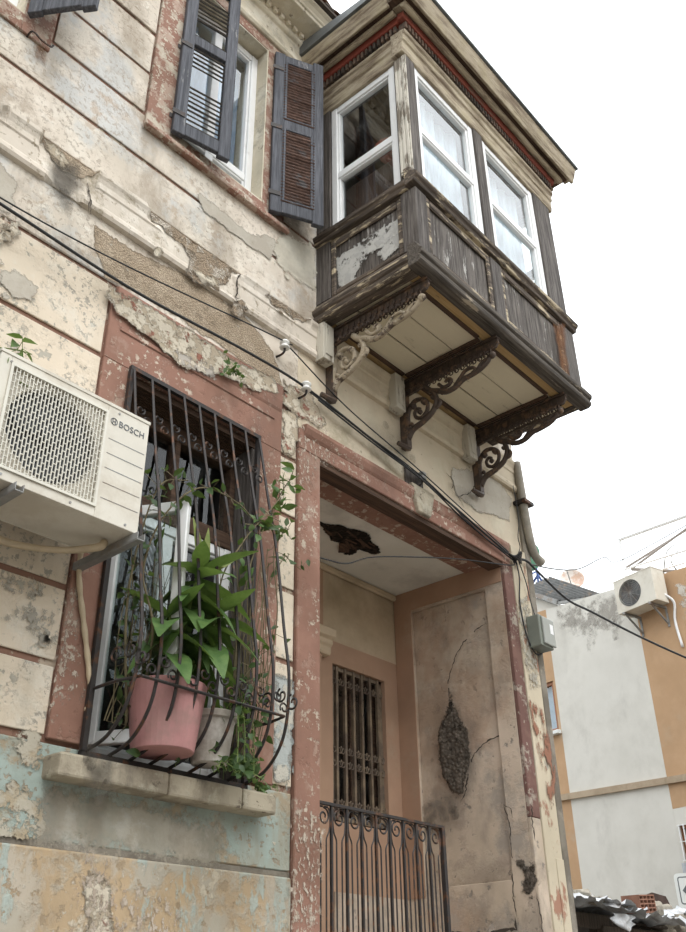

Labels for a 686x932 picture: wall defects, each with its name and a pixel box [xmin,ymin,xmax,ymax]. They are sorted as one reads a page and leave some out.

flaking render [0,164,21,245]
damp [54,163,76,193]
flaking render [197,193,317,290]
peeling [336,219,399,287]
flaking render [94,225,334,484]
flaking render [451,467,512,521]
crack [448,624,485,697]
peeling [273,673,295,790]
crack [461,735,499,799]
peeling [289,808,325,932]
crack [452,801,535,932]
flaking render [516,859,537,899]